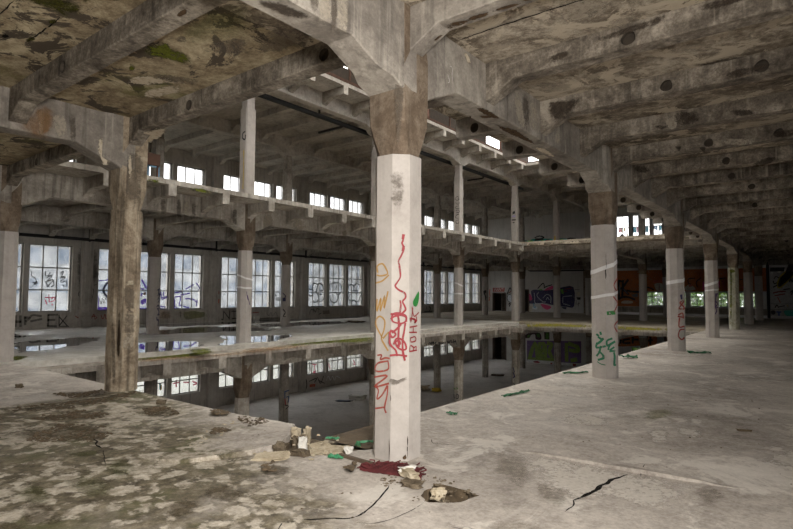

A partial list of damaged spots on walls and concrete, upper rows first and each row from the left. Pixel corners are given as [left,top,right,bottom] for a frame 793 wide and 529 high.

crack [566,464,645,511]